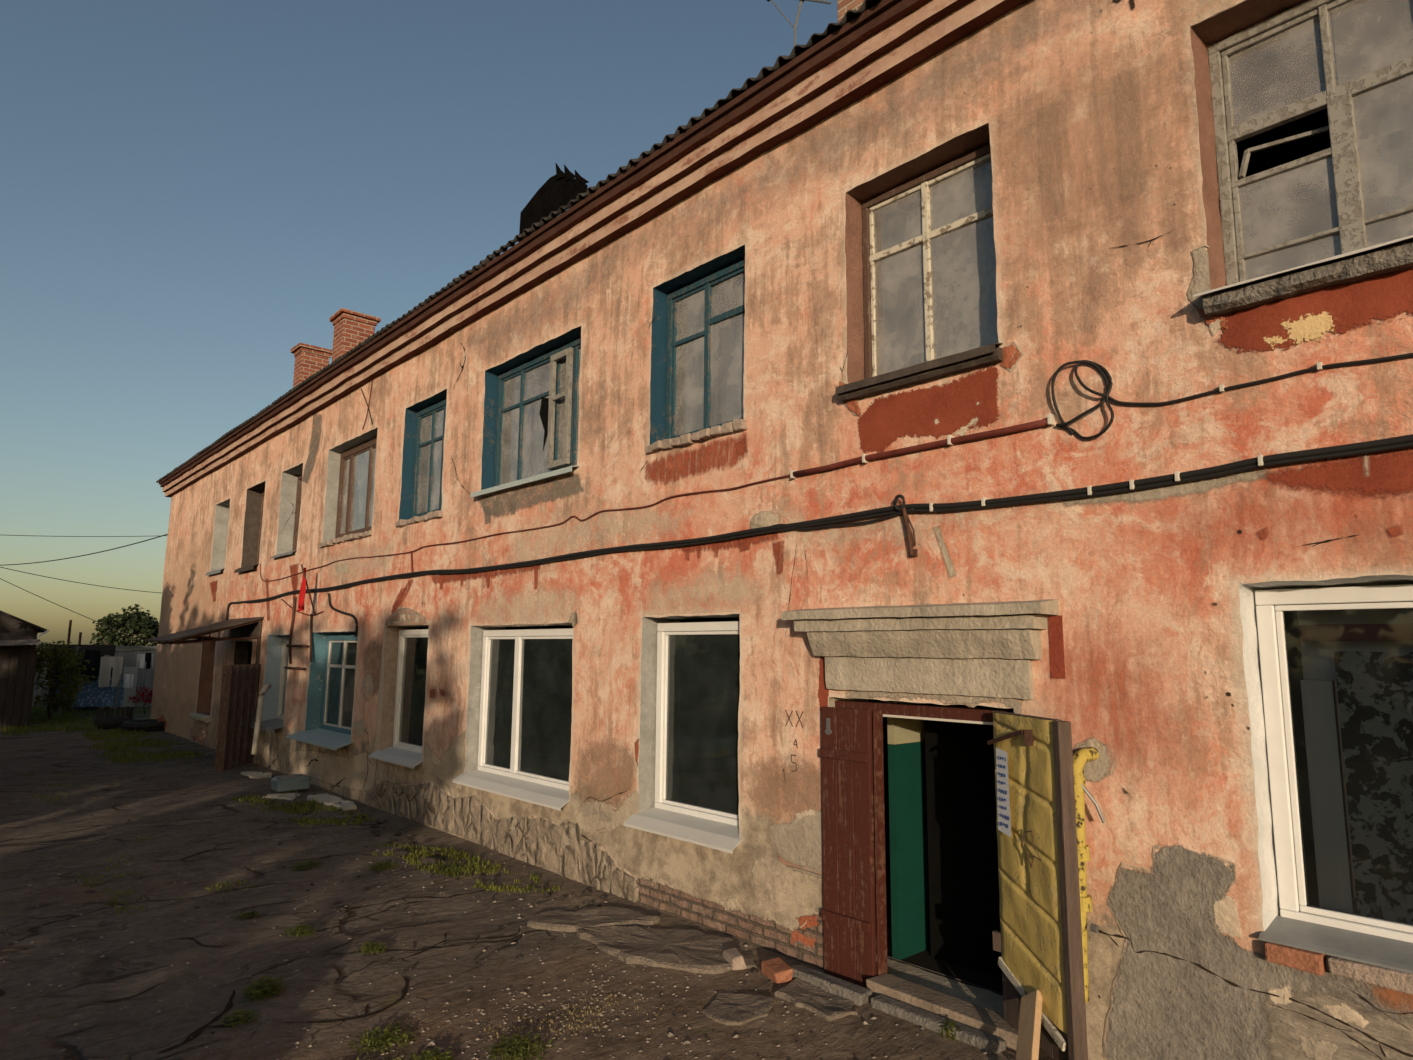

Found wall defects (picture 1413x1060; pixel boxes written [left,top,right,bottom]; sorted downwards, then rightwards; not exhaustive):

peeling [1186,245,1413,353]
peeling [839,341,1024,453]
spalling [385,607,426,626]
spalling [294,718,824,970]
crack [1099,930,1413,1060]
peeling [1102,844,1413,1060]